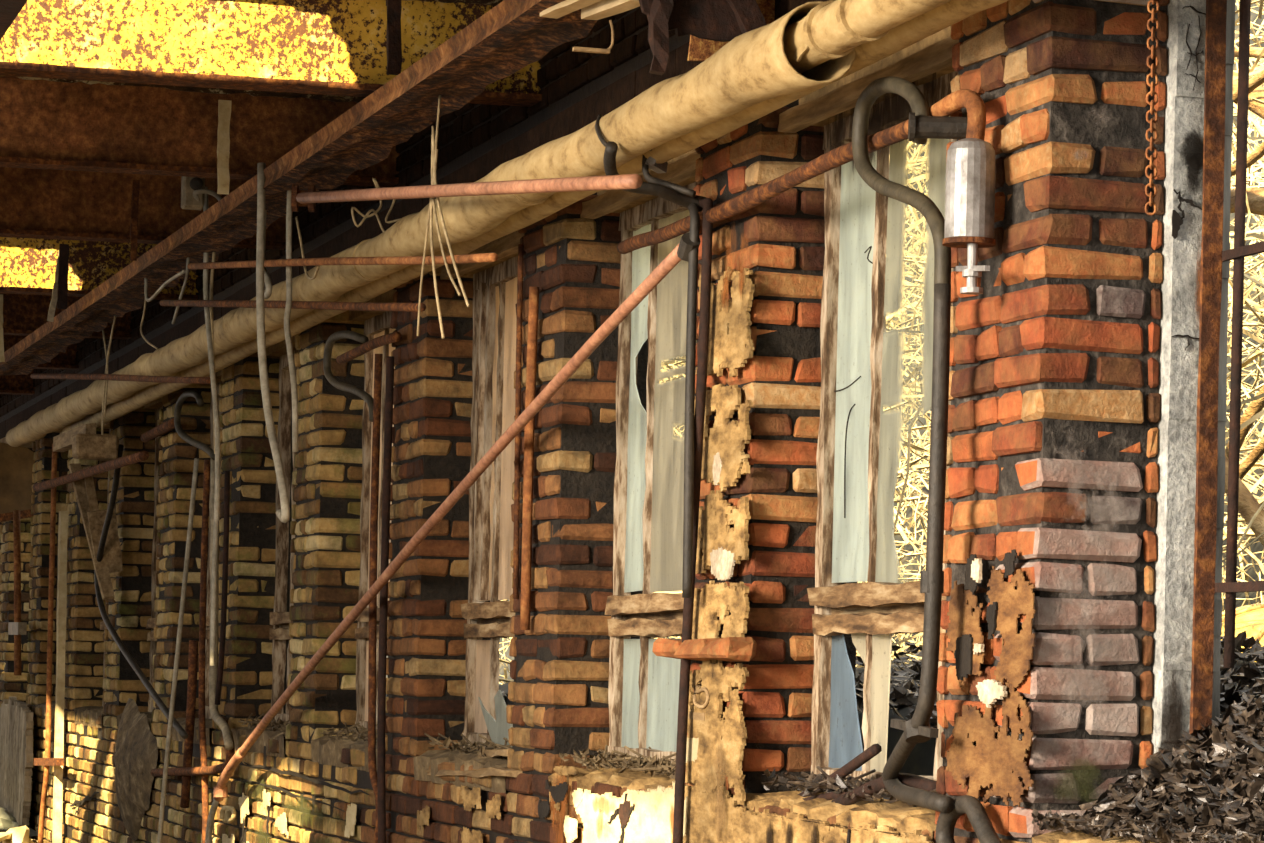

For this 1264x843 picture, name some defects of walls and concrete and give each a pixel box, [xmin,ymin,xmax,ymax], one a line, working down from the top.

crack [1183,6,1206,91]
crack [1174,189,1202,220]
damp [1186,156,1200,193]
flaking render [692,266,755,640]
peeling [946,549,1036,806]
flaking render [538,659,934,843]
peeling [417,805,430,830]
peeling [460,785,501,843]